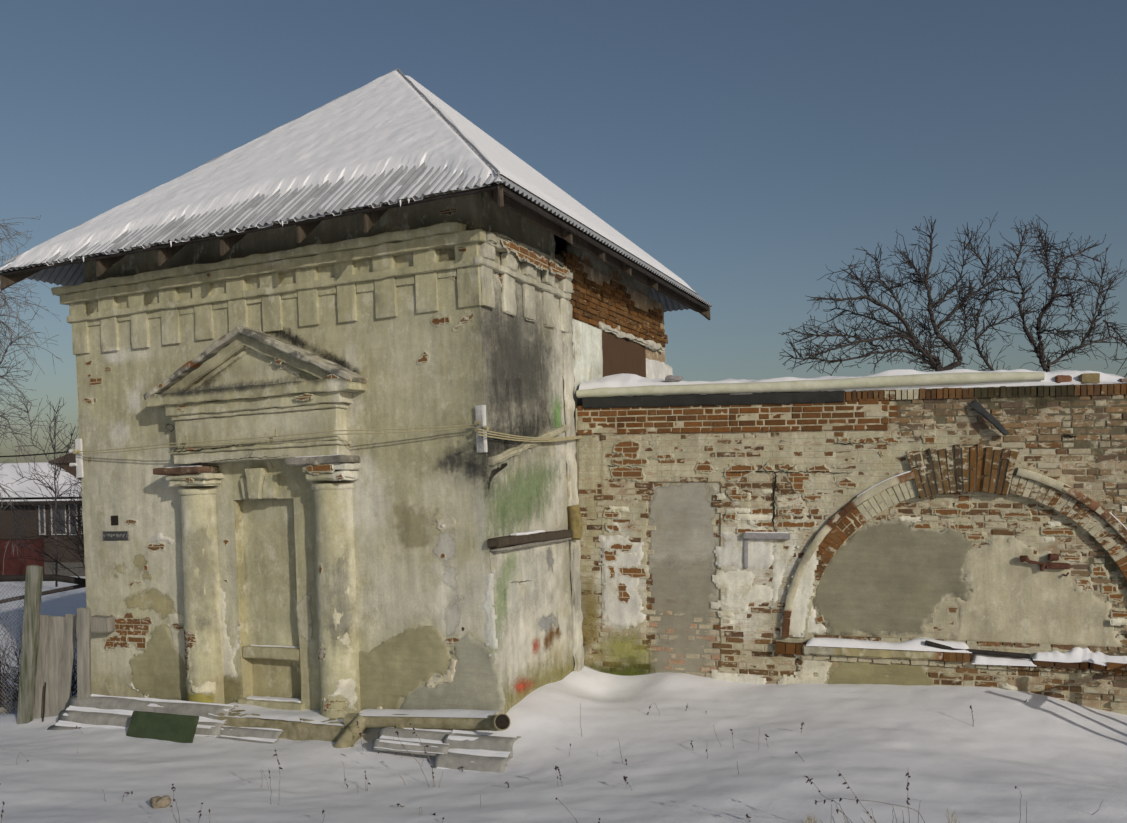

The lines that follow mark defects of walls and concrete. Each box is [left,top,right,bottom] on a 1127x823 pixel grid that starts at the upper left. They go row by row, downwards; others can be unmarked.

flaking render [103,532,241,701]
peeling [599,509,650,629]
peeling [694,459,859,637]
crack [722,464,851,532]
spalling [711,654,1127,691]
peeling [900,501,1127,648]